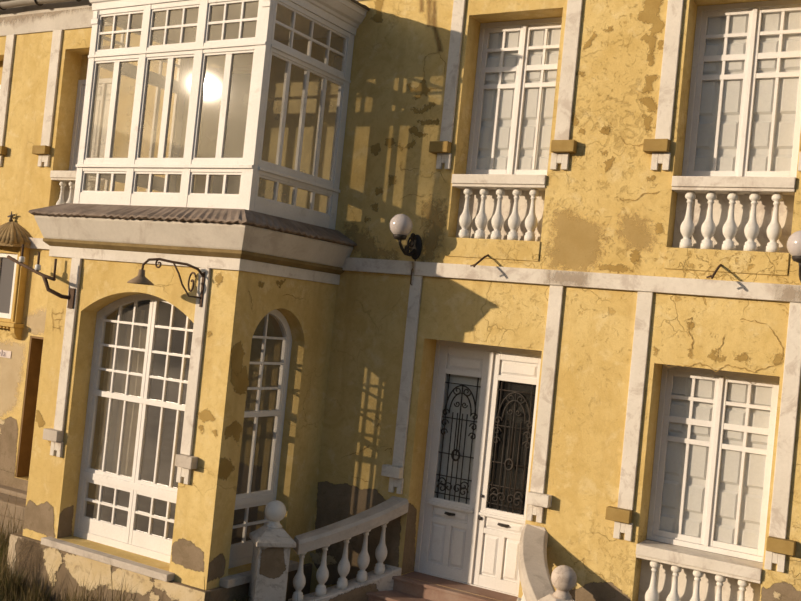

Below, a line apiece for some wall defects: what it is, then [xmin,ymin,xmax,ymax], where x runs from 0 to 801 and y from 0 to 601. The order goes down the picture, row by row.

peeling [638,0,665,131]
peeling [371,80,439,156]
crack [657,317,783,373]
peeling [230,342,250,395]
peeling [197,410,242,442]
peeling [218,458,235,481]
peeling [0,417,74,586]
peeling [108,568,159,601]
peeling [171,538,226,583]
peeling [259,547,286,579]
peeling [569,582,631,601]
peeling [761,582,801,601]